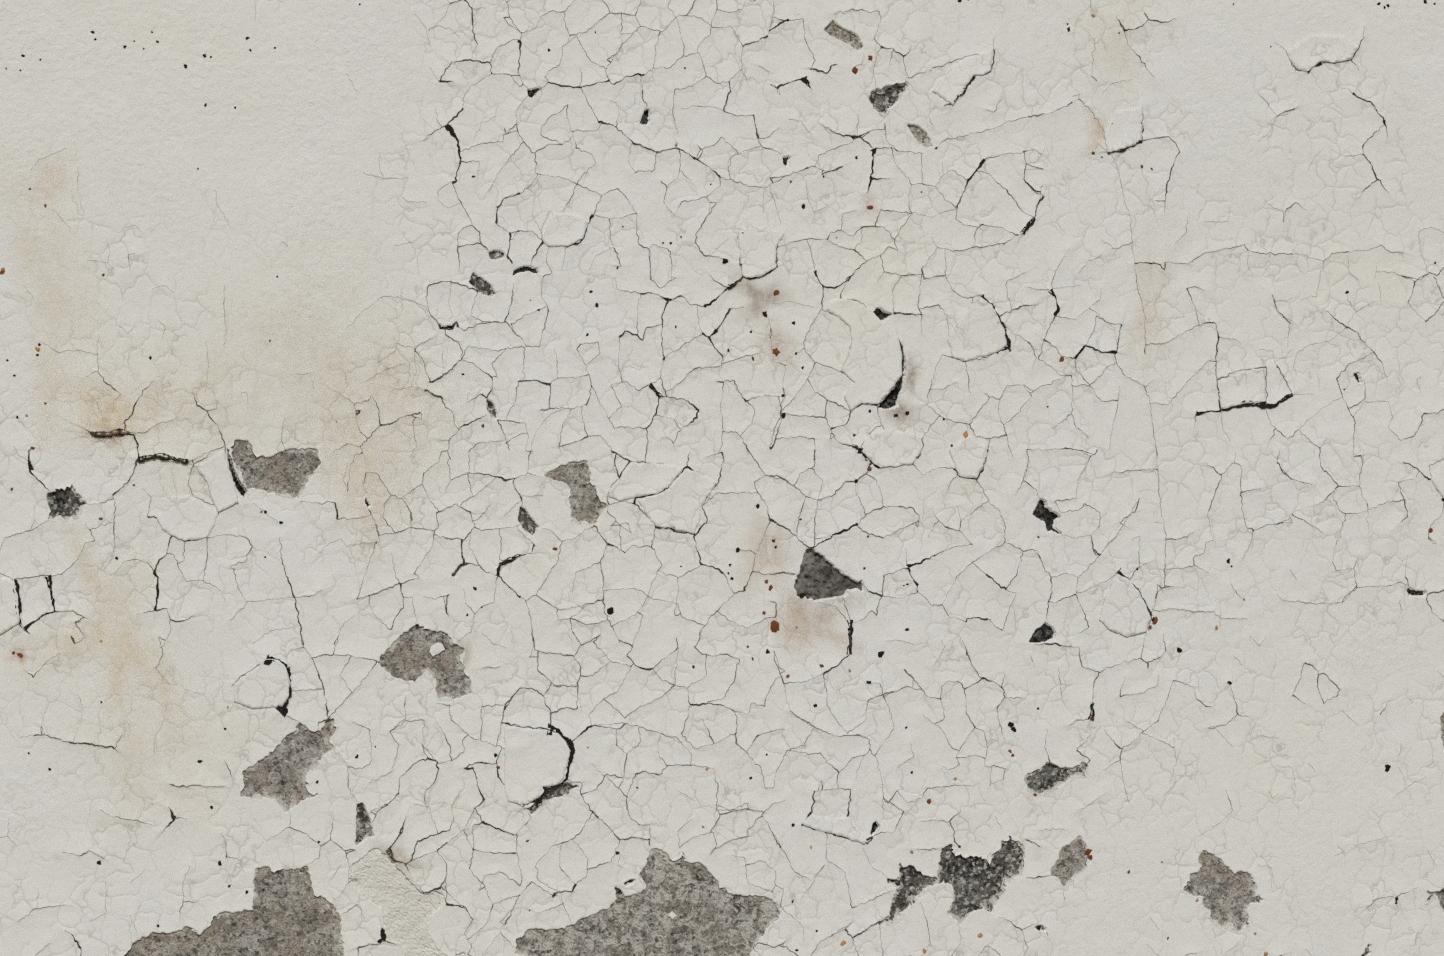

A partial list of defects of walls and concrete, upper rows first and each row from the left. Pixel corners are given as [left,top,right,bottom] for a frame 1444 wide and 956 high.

crack [0,286,235,677]
peeling [157,440,323,541]
crack [301,0,1444,956]
crack [114,495,378,729]
peeling [794,548,866,600]
crack [24,694,155,754]
crack [100,764,232,831]
peeling [239,717,339,812]
peeling [120,866,344,956]
crack [267,813,394,954]
peeling [515,848,794,956]
peeling [878,834,1026,925]